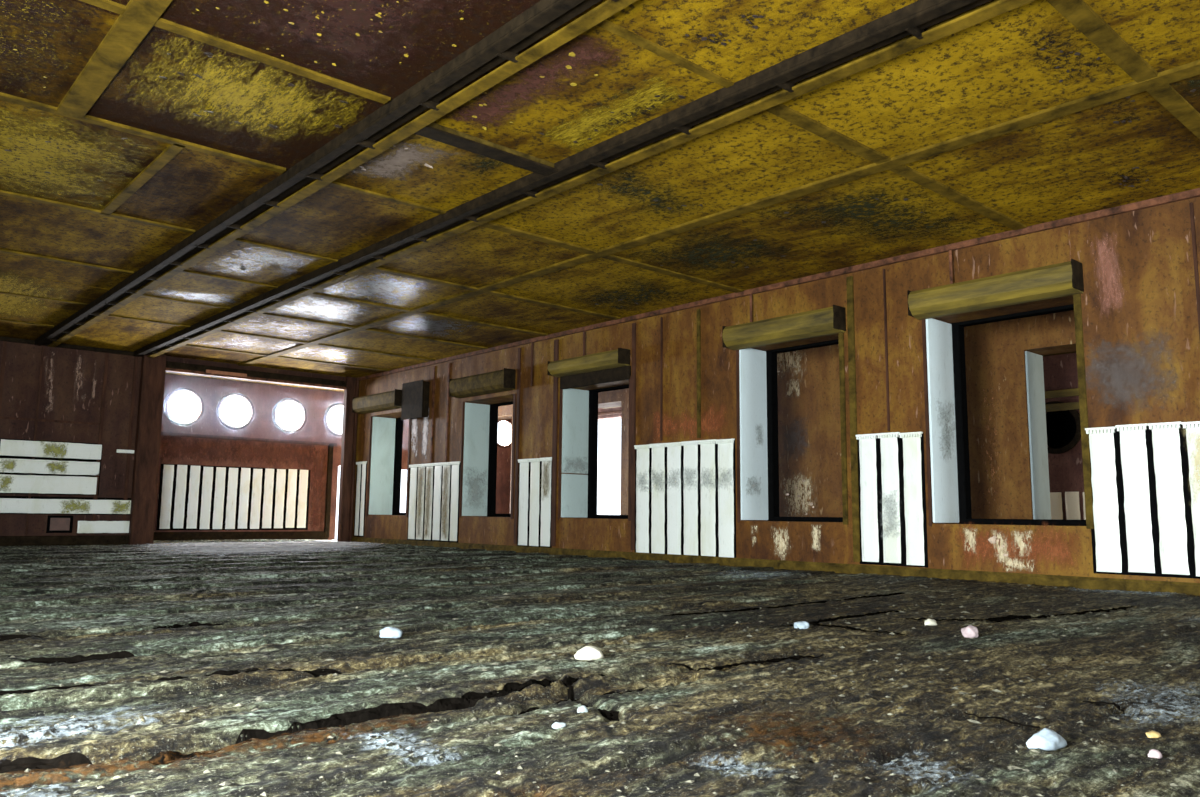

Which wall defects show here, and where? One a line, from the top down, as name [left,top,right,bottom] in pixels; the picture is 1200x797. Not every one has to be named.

leakage [597,168,703,218]
leakage [768,182,984,242]
peeling [965,529,1034,571]
crack [153,621,221,629]
crack [0,634,342,696]
crack [131,674,646,765]
crack [0,752,93,773]